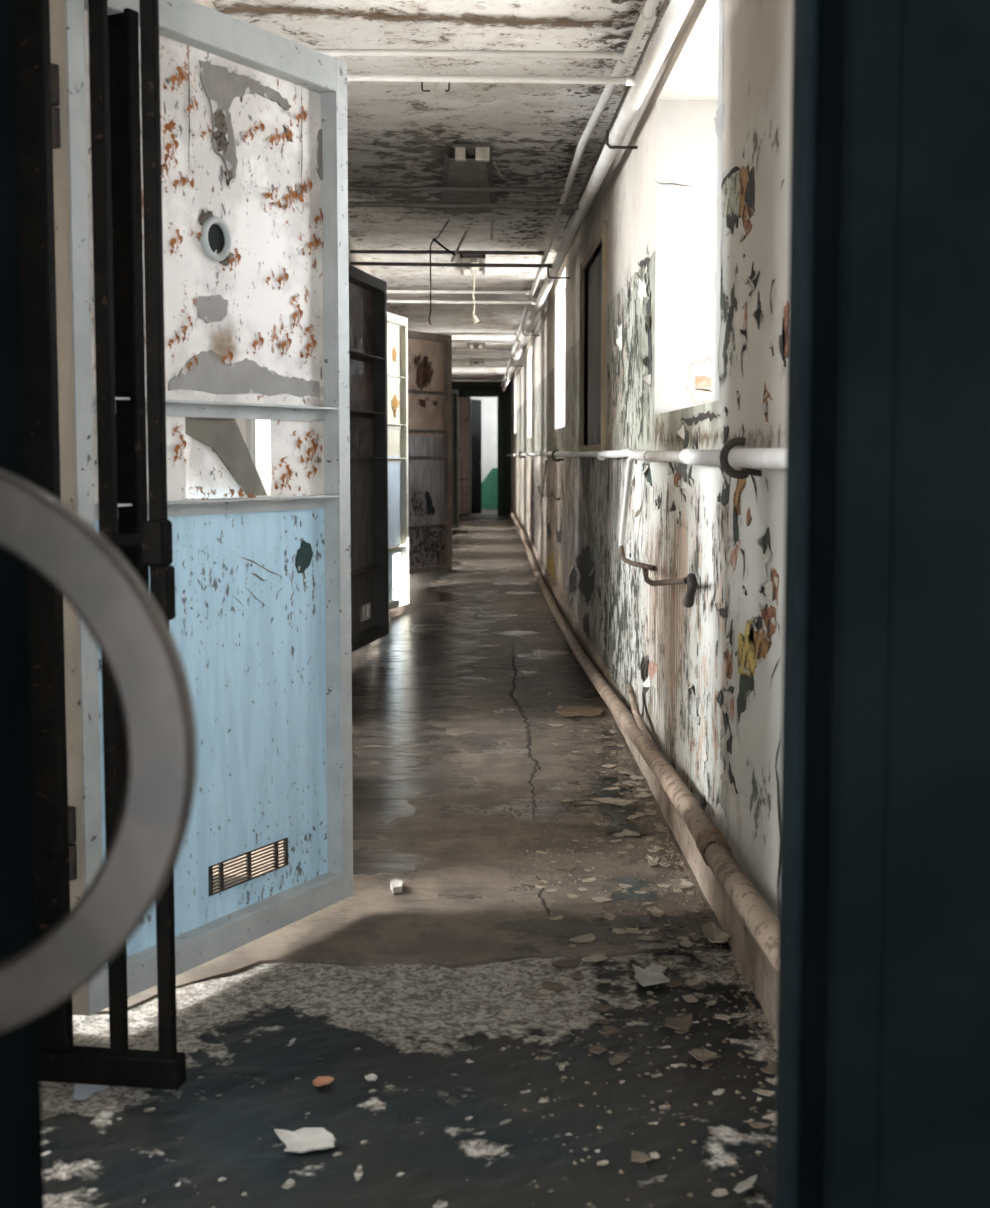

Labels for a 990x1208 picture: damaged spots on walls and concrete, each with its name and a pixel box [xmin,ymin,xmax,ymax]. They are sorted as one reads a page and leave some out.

corrosion [161,59,198,192]
peeling [199,60,292,183]
corrosion [243,105,311,150]
water stain [213,0,664,248]
peeling [168,350,325,397]
corrosion [262,177,313,213]
corrosion [266,266,318,363]
water stain [726,213,739,236]
peeling [716,163,789,377]
peeling [701,527,779,797]
crack [464,641,542,817]
crack [536,875,550,918]